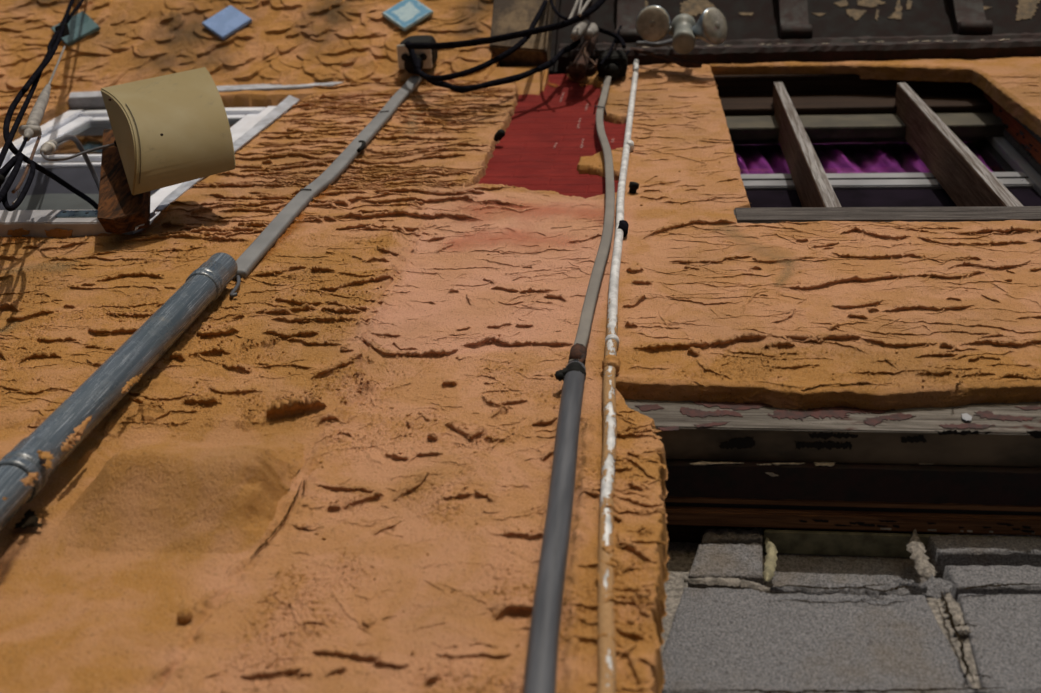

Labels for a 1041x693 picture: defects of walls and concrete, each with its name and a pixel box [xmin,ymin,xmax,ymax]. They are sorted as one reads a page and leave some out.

peeling [680,0,716,17]
peeling [812,0,912,21]
peeling [1015,0,1041,21]
spalling [478,74,626,199]
peeling [658,401,915,476]
peeling [901,405,1041,443]